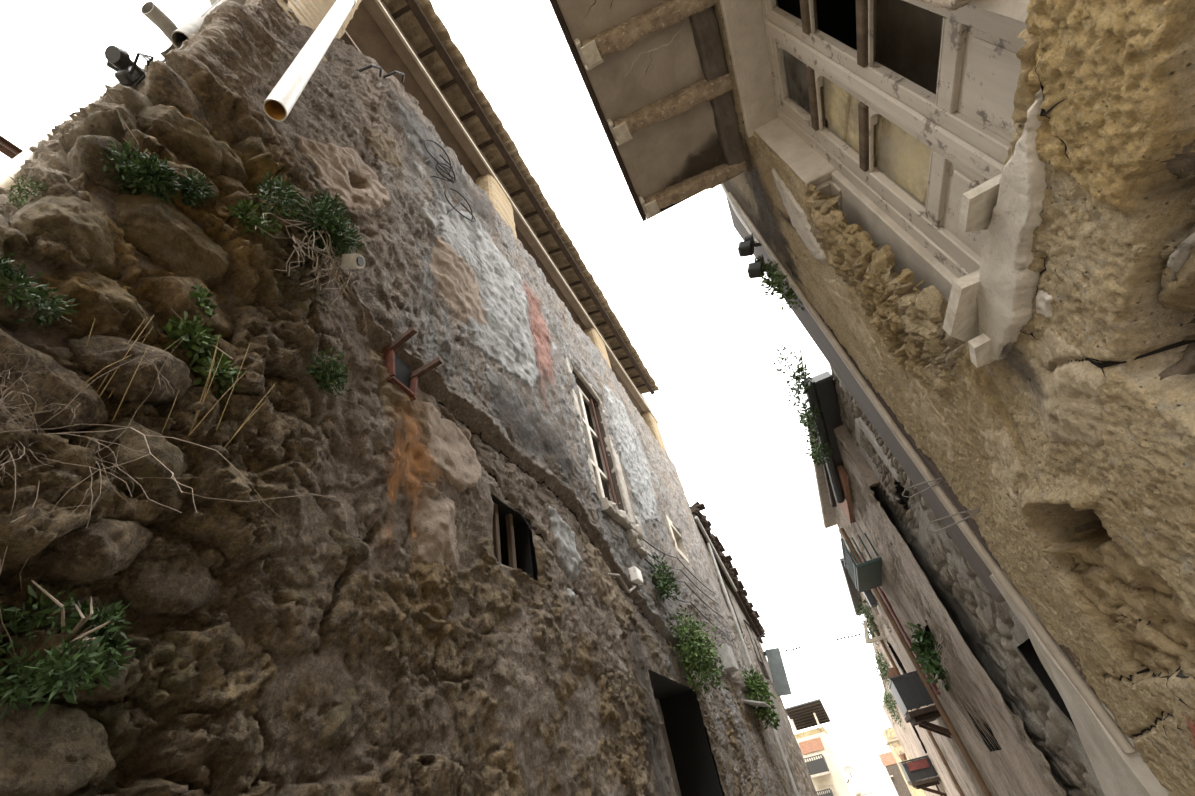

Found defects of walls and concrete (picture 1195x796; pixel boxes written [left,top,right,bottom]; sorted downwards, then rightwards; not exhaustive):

peeling [771,28,1053,379]
spalling [1160,140,1195,181]
spalling [1157,225,1195,381]
spalling [1037,520,1195,682]